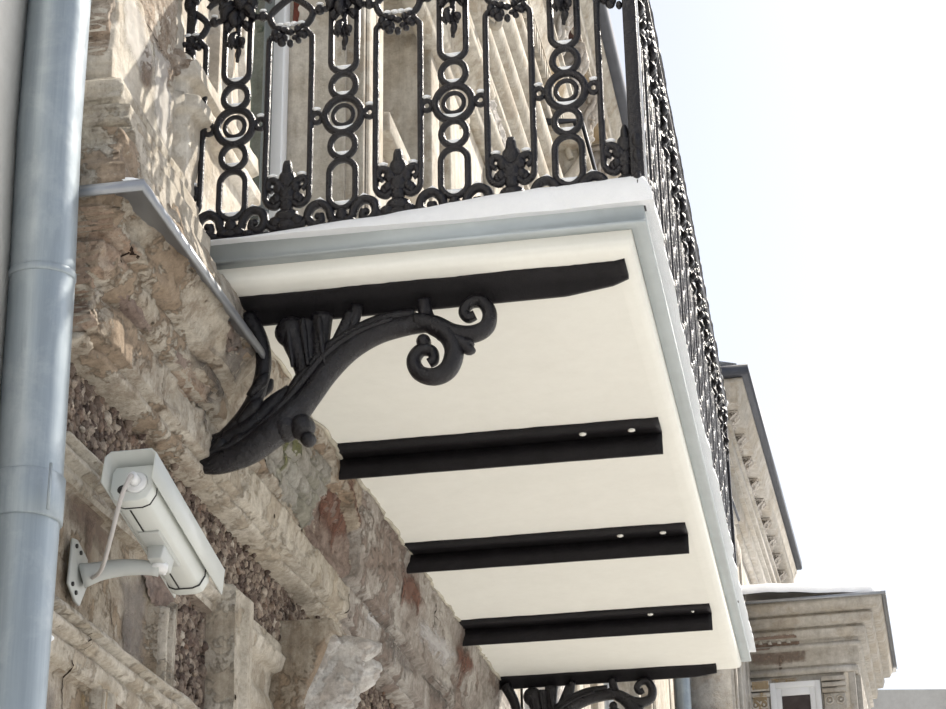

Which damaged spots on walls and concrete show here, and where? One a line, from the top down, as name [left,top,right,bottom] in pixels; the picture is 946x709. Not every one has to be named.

spalling [87,0,194,140]
crack [61,605,115,705]